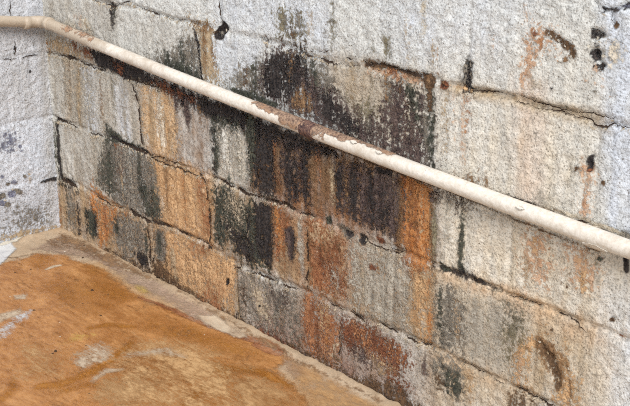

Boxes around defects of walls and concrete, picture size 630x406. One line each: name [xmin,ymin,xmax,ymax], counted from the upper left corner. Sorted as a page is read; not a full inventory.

leakage [149,7,438,169]
corrosion [519,23,563,96]
crack [471,90,630,131]
leakage [0,50,421,406]
corrosion [90,82,414,383]
corrosion [397,173,436,349]